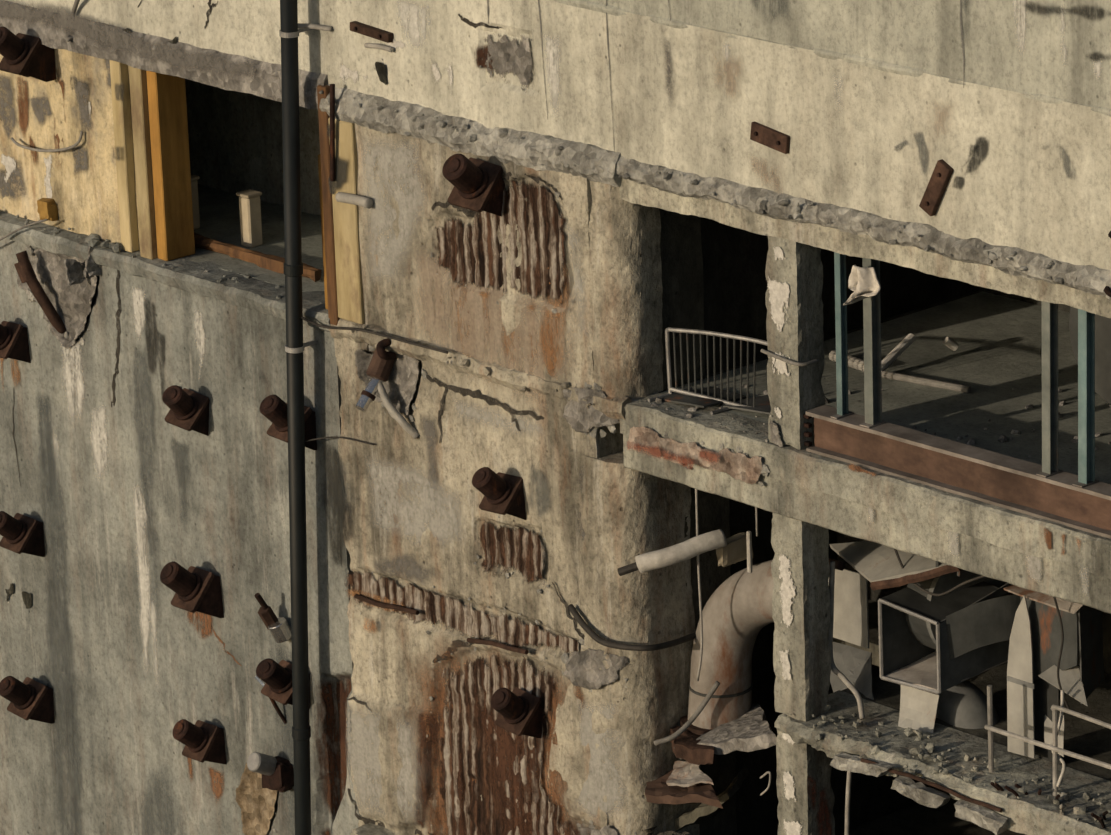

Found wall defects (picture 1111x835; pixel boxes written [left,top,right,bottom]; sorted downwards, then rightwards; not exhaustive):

spalling [427,179,575,314]
spalling [14,245,98,349]
corrosion [420,258,568,379]
peeling [767,277,790,332]
crack [421,374,544,443]
spalling [563,382,770,488]
spalling [474,516,550,594]
peeling [779,555,796,628]
spalling [344,571,628,835]
spalling [235,763,278,835]
peeling [783,771,796,802]
spalling [861,758,1003,813]